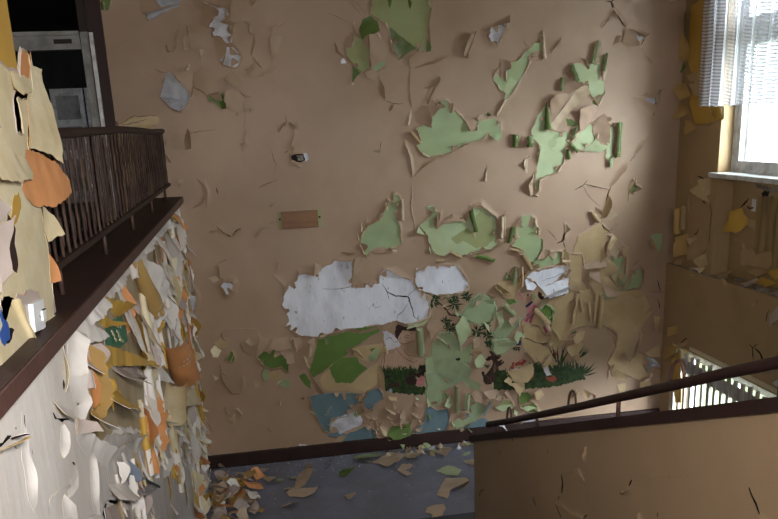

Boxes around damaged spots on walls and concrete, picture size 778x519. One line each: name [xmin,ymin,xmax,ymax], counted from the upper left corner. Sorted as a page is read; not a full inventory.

peeling [192,0,252,70]
crack [599,0,628,28]
peeling [115,114,171,188]
peeling [276,121,309,168]
peeling [334,0,663,197]
peeling [0,47,72,366]
peeling [673,168,712,276]
peeling [723,198,778,287]
spalling [49,190,654,519]
peeling [21,412,38,512]